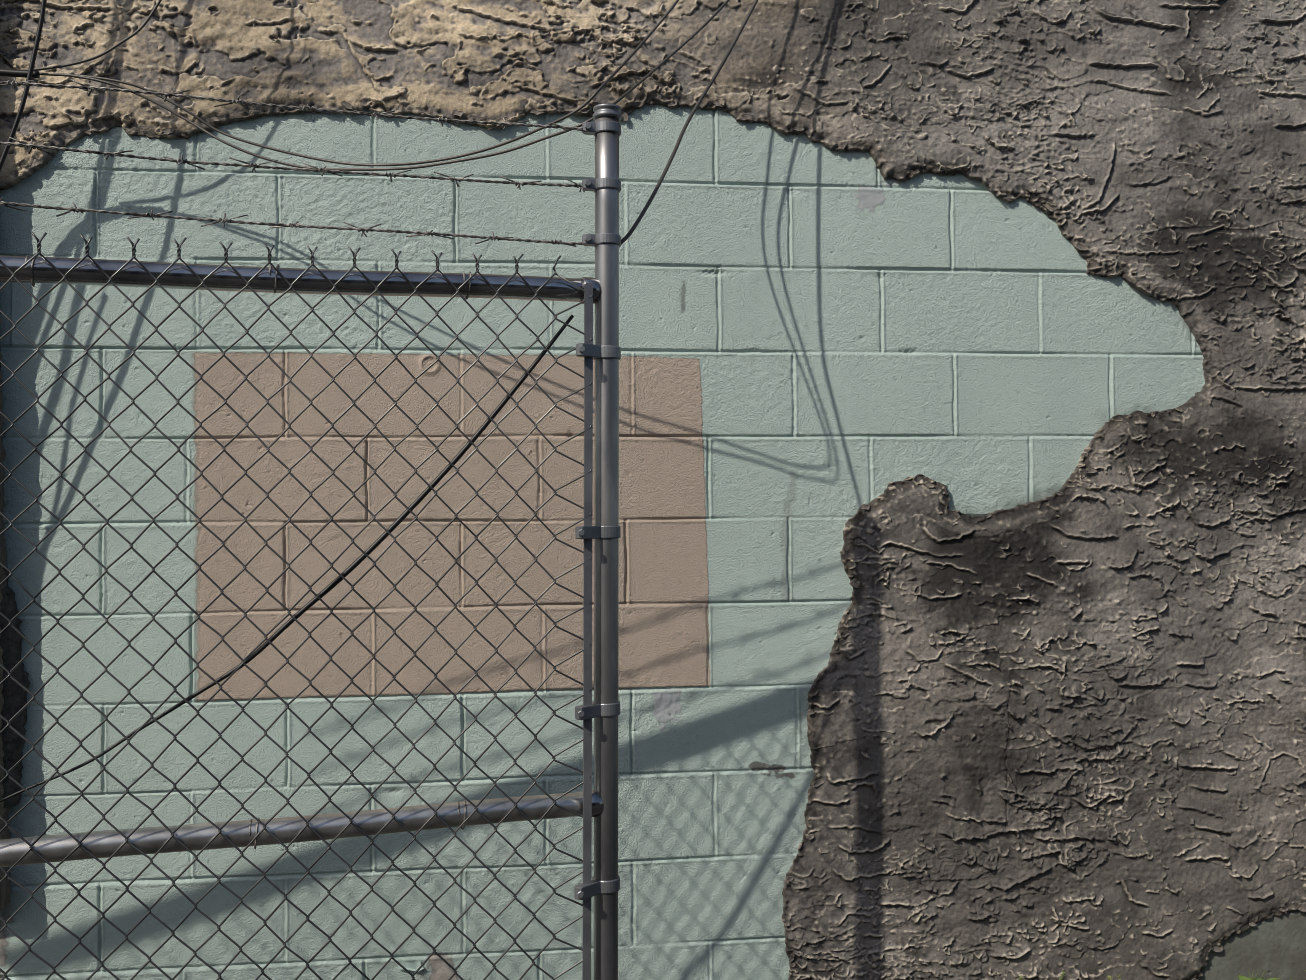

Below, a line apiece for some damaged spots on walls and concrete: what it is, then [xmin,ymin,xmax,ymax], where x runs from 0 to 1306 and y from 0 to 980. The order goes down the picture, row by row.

spalling [0,100,594,189]
spalling [620,91,1150,295]
spalling [782,410,1155,980]
peeling [749,761,794,778]
peeling [397,953,457,980]
spalling [1191,905,1306,980]